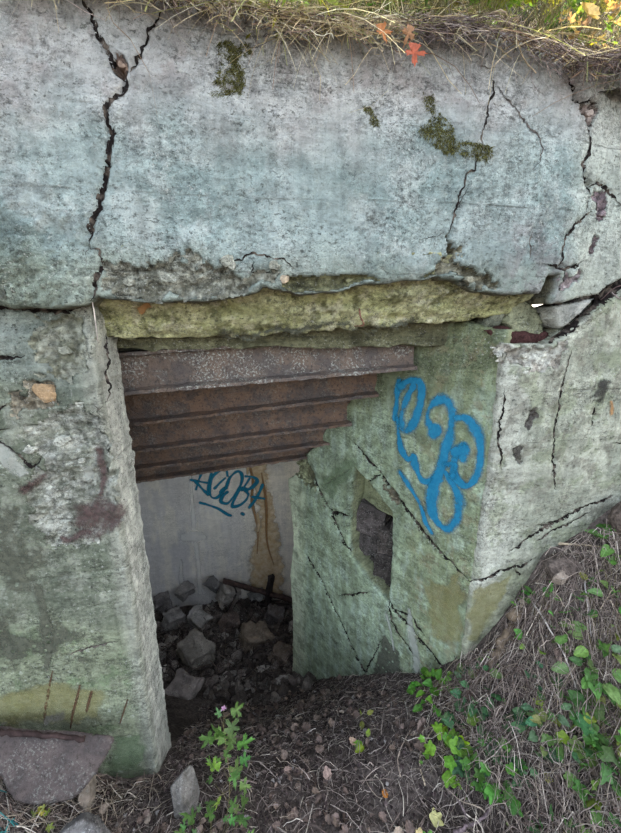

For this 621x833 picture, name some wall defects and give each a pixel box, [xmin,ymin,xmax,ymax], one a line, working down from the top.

crack [0,0,161,315]
crack [424,48,544,239]
crack [529,72,621,271]
spalling [101,248,380,304]
spalling [424,235,499,290]
spalling [556,269,581,291]
crack [497,388,506,469]
crack [547,279,621,489]
leakage [247,464,284,594]
crack [354,442,614,582]
crack [308,556,441,675]
corrosion [70,685,93,729]